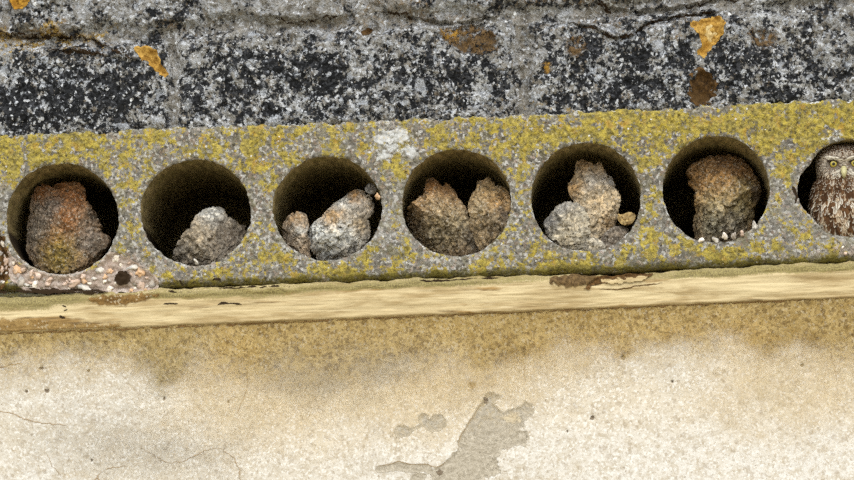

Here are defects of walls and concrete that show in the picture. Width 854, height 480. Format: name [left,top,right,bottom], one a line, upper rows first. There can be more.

crack [388,11,432,22]
crack [568,0,739,39]
spalling [0,236,159,294]
leakage [0,298,854,384]
peeling [375,392,535,480]